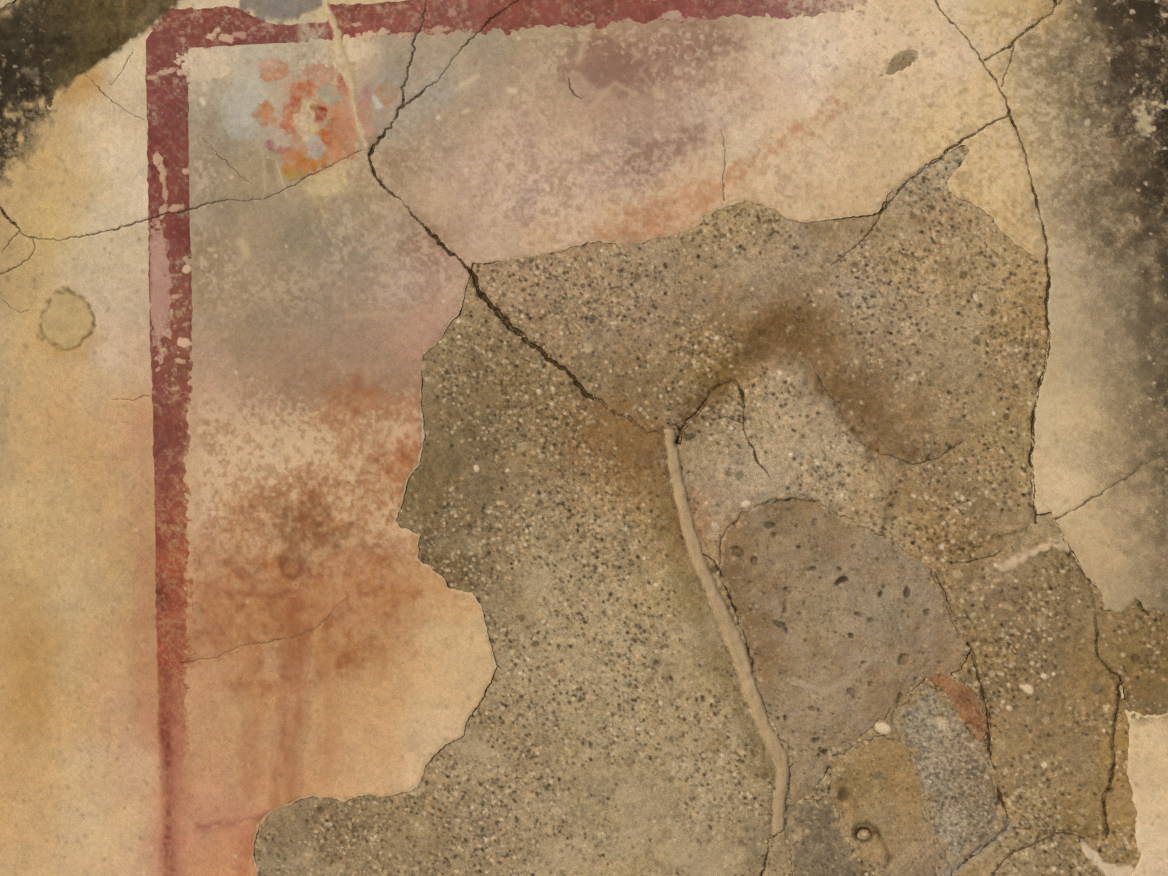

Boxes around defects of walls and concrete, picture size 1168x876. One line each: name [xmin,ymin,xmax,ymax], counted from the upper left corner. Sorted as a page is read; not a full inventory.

leakage [47,67,104,110]
crack [0,0,769,476]
leakage [396,299,929,606]
spalling [254,145,1168,876]
crack [702,553,766,703]
crack [813,366,841,404]
crack [831,0,1168,876]
crack [761,835,775,876]